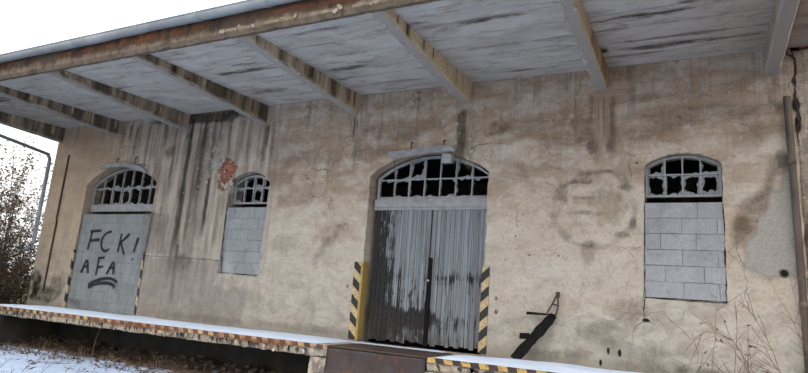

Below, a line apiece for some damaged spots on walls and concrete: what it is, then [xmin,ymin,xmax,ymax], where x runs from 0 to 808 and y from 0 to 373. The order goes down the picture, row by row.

rust [62,18,220,56]
leakage [173,110,243,244]
flaking render [196,129,240,193]